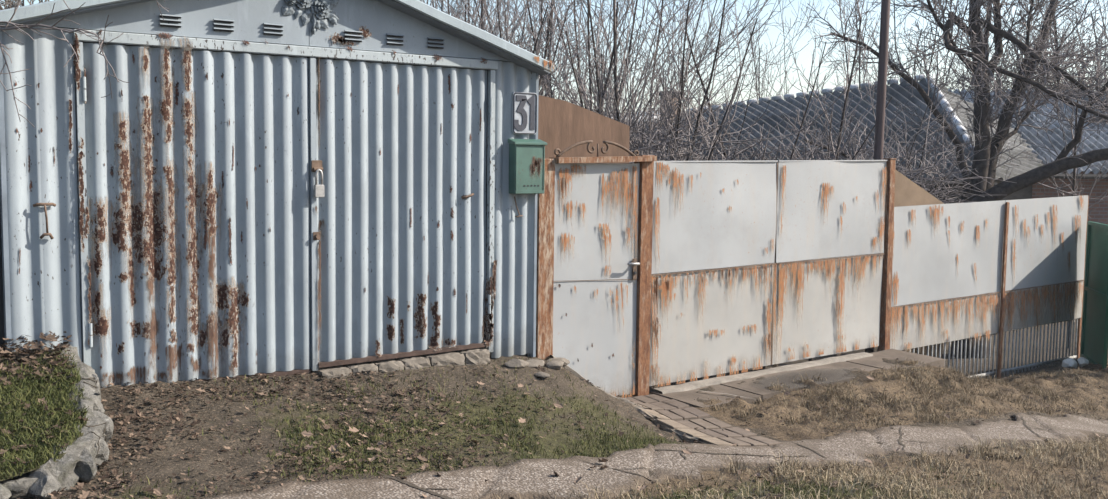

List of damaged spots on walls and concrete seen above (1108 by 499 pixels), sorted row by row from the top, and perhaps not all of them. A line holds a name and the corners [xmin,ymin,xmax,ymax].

rust [326,26,372,47]
rust [69,33,249,385]
rust [375,293,456,357]
rust [482,260,498,347]
rust [558,165,586,218]
rust [599,166,638,275]
rust [651,162,894,387]
rust [929,205,988,273]
rust [891,272,1083,350]
rust [1012,196,1084,278]